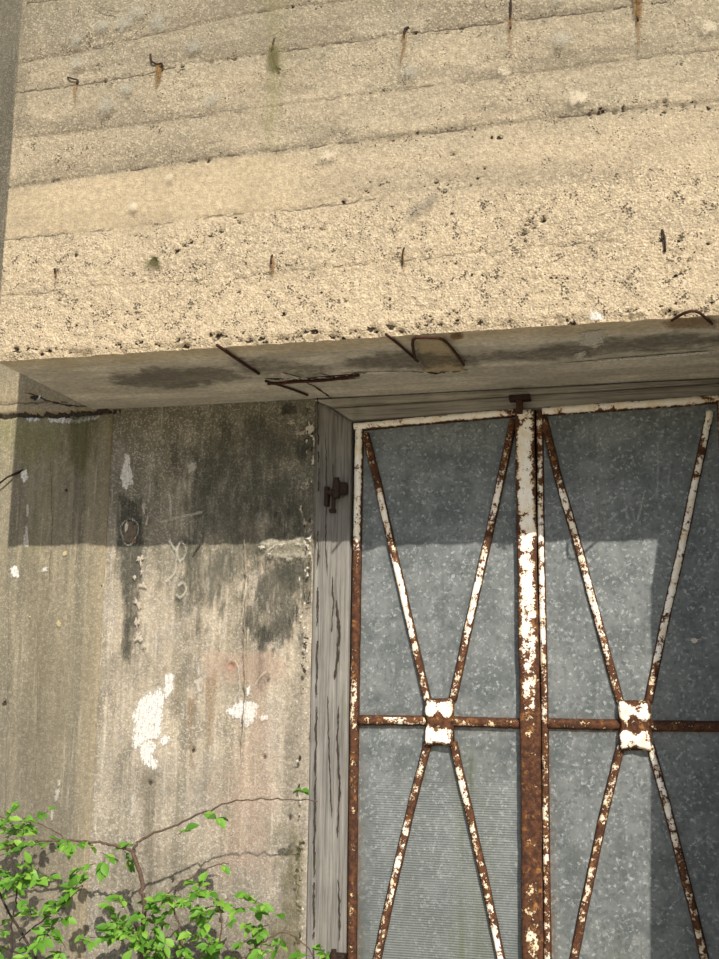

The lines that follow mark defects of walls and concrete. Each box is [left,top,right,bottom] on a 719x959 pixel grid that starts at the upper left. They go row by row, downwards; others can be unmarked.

rust [634,0,642,47]
leakage [117,454,144,659]
leakage [175,420,314,654]
leakage [132,674,174,771]
leakage [226,668,269,727]